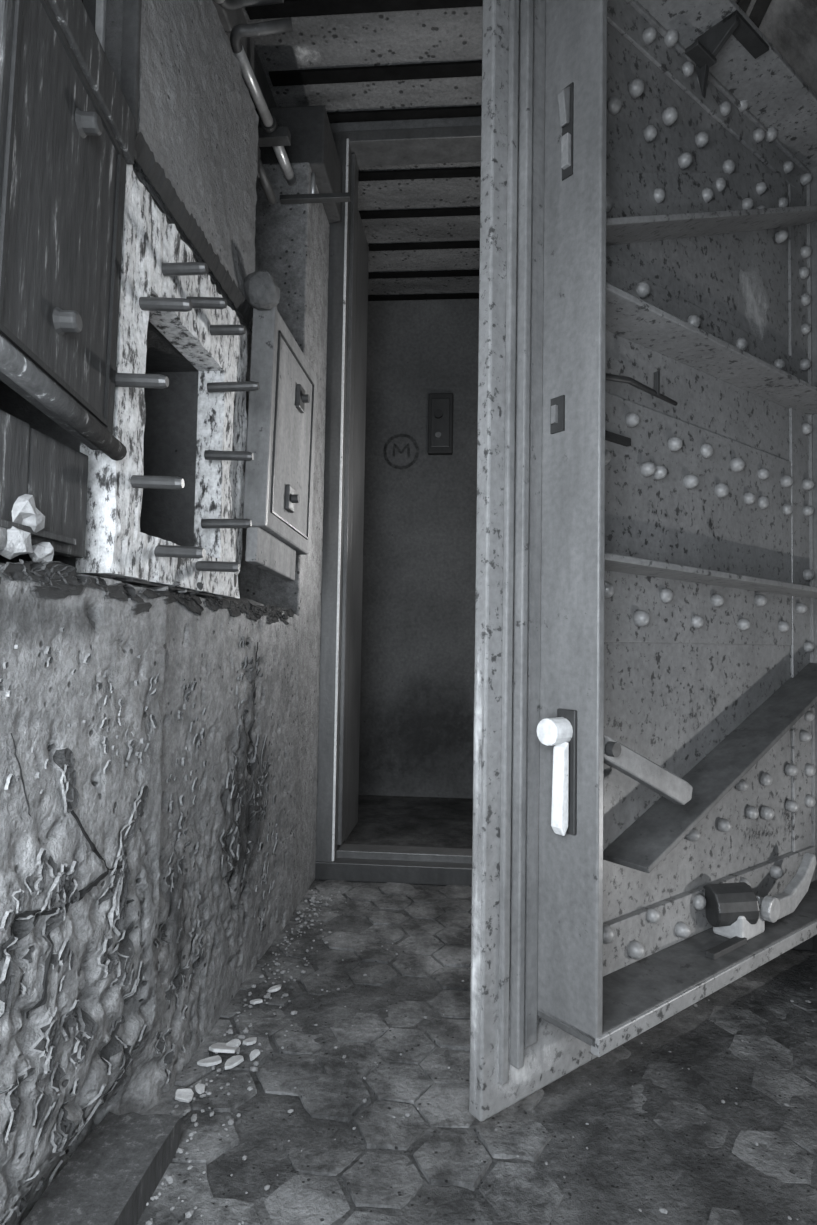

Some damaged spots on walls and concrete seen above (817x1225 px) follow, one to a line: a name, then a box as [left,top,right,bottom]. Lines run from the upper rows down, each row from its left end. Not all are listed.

spalling [0,559,294,625]
spalling [220,636,279,931]
spalling [0,671,206,1225]
peeling [250,985,281,1005]
peeling [197,1039,260,1070]